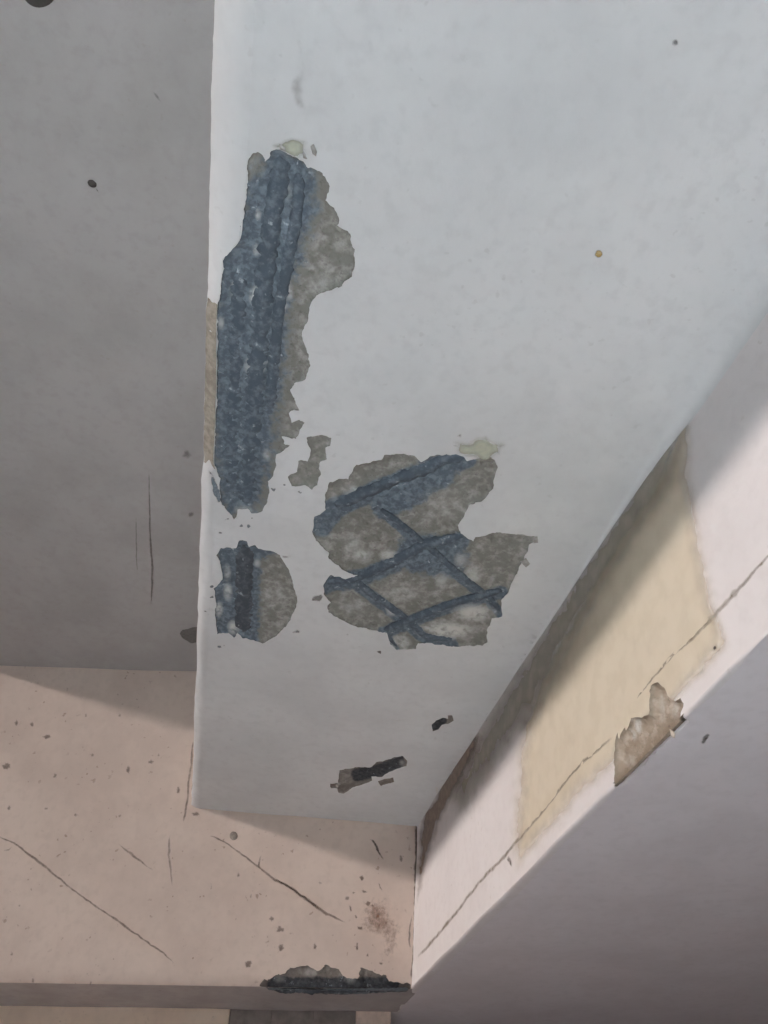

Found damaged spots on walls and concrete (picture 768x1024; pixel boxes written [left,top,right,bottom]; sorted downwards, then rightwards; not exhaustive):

spalling [204,141,538,654]
crack [687,562,763,643]
leakage [419,438,721,875]
peeling [330,756,407,794]
peeling [432,715,454,731]
spalling [614,682,686,787]
crack [5,839,163,953]
crack [217,838,339,920]
crack [409,745,603,976]
spalling [260,965,411,995]